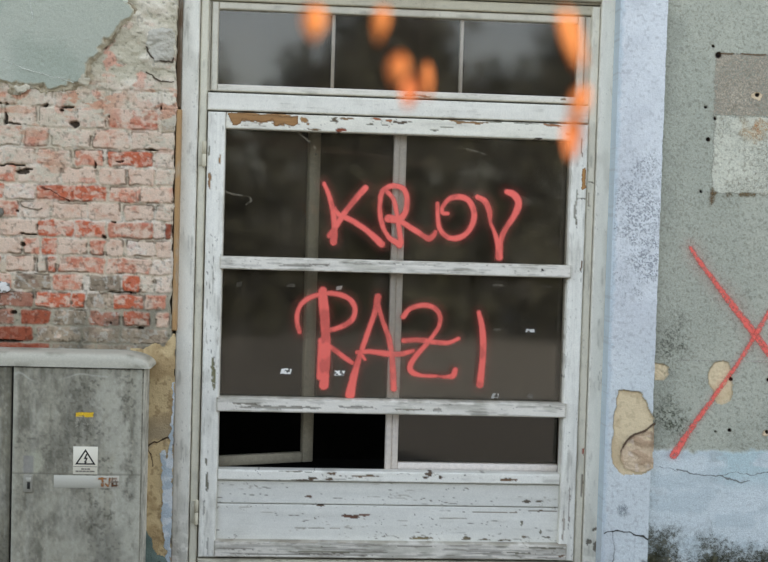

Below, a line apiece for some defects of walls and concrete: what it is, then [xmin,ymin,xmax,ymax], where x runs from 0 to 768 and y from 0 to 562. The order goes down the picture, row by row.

flaking render [0,0,138,95]
peeling [228,112,298,126]
flaking render [654,363,669,380]
flaking render [708,360,733,405]
flaking render [131,334,176,562]
flaking render [611,390,656,475]
crack [659,466,768,483]
damp [643,525,768,562]